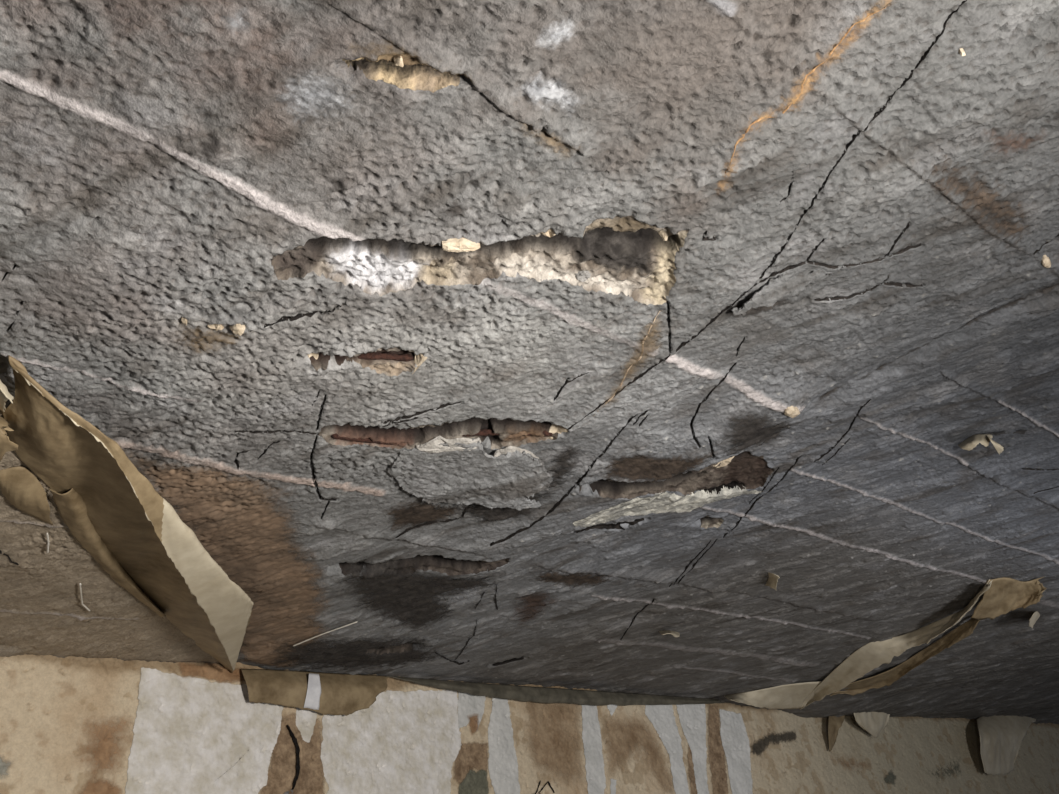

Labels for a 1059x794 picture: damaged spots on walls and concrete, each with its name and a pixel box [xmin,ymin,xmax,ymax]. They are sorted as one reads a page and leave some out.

corrosion [724,6,887,178]
spalling [272,216,689,305]
crack [568,0,967,430]
peeling [0,355,254,673]
crack [235,390,337,519]
spalling [319,417,568,459]
crack [490,410,649,546]
crack [554,373,587,401]
spalling [573,451,774,527]
crack [621,337,936,640]
leakage [271,559,492,669]
peeling [725,577,1047,710]